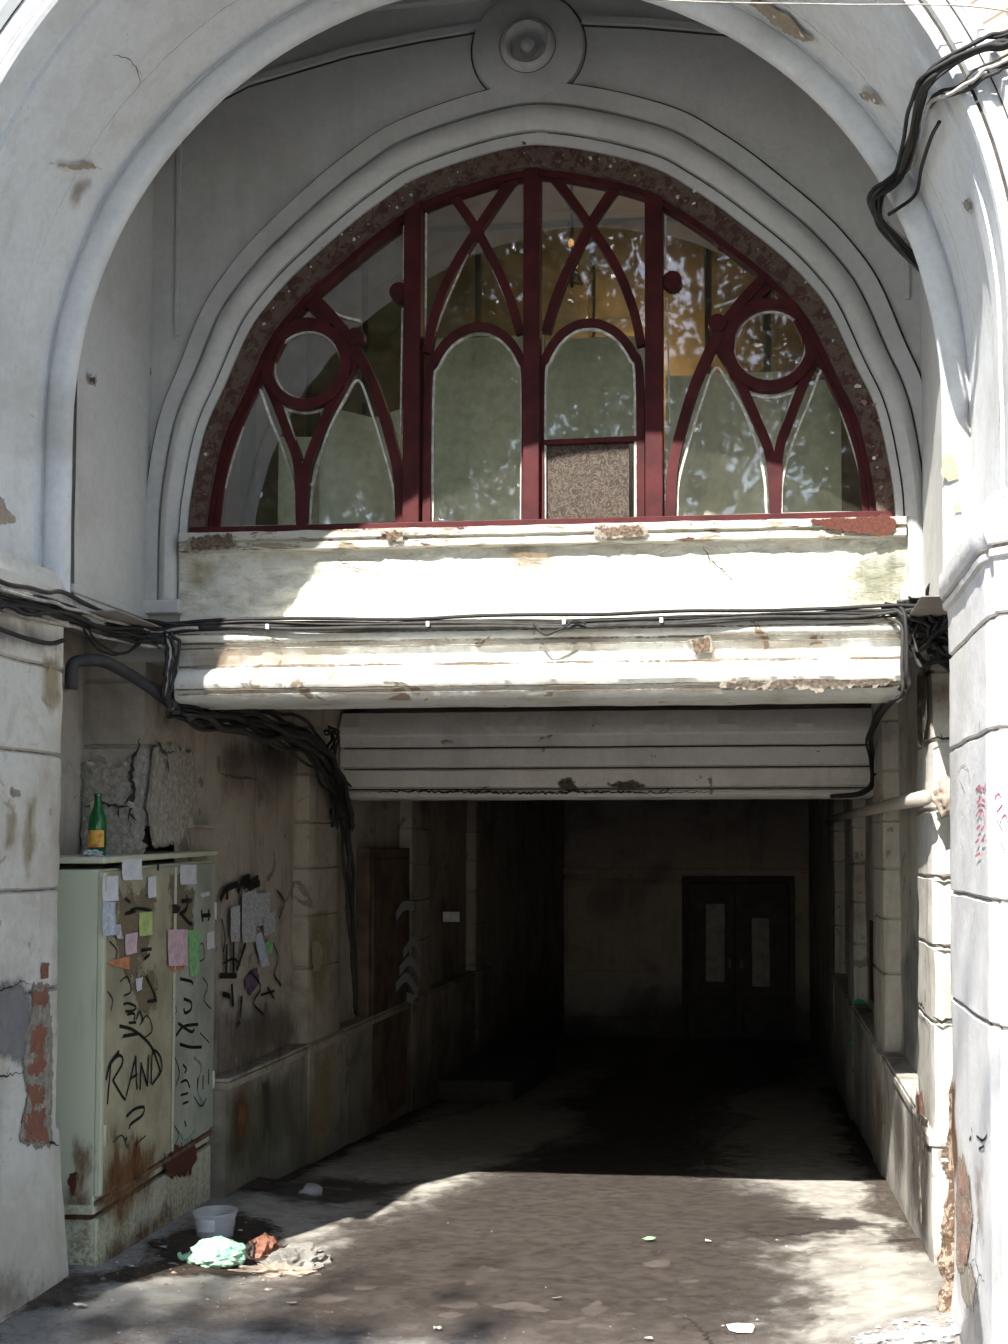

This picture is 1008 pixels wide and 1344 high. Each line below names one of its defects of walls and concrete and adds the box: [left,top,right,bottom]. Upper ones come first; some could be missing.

peeling [747,0,814,42]
peeling [50,162,102,170]
peeling [810,513,896,537]
crack [86,727,272,833]
crack [933,874,951,882]
crack [914,996,952,1024]
spalling [19,962,54,1150]
damp [876,1090,913,1209]
spalling [911,1073,978,1313]